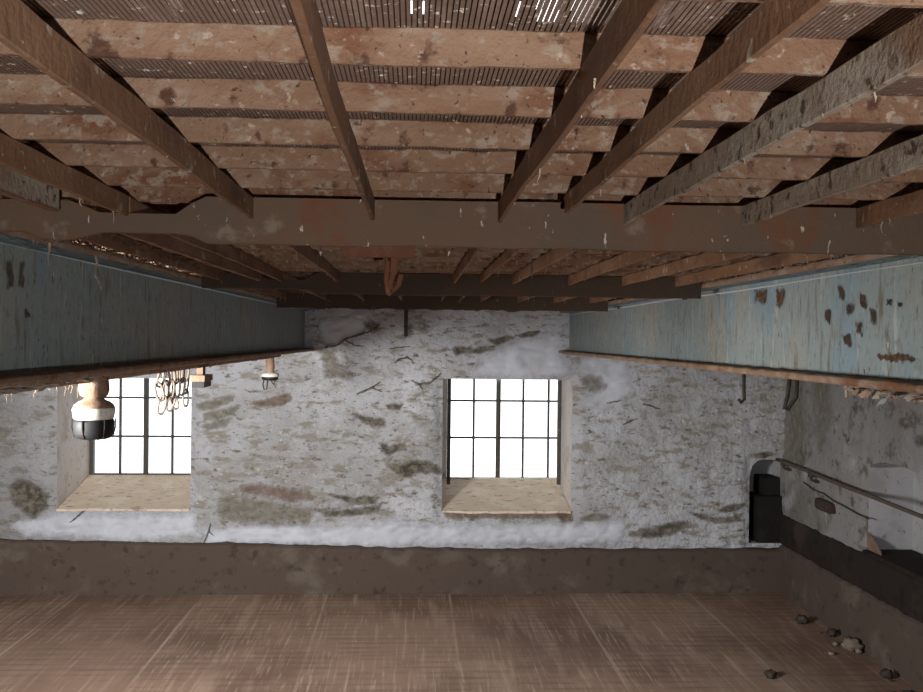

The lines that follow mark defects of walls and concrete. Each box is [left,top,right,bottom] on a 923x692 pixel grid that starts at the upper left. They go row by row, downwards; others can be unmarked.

corrosion [7,262,24,287]
corrosion [755,288,784,308]
corrosion [838,286,876,347]
corrosion [877,352,915,363]
peeling [0,377,101,395]
peeling [843,386,923,406]
leakage [220,499,311,524]